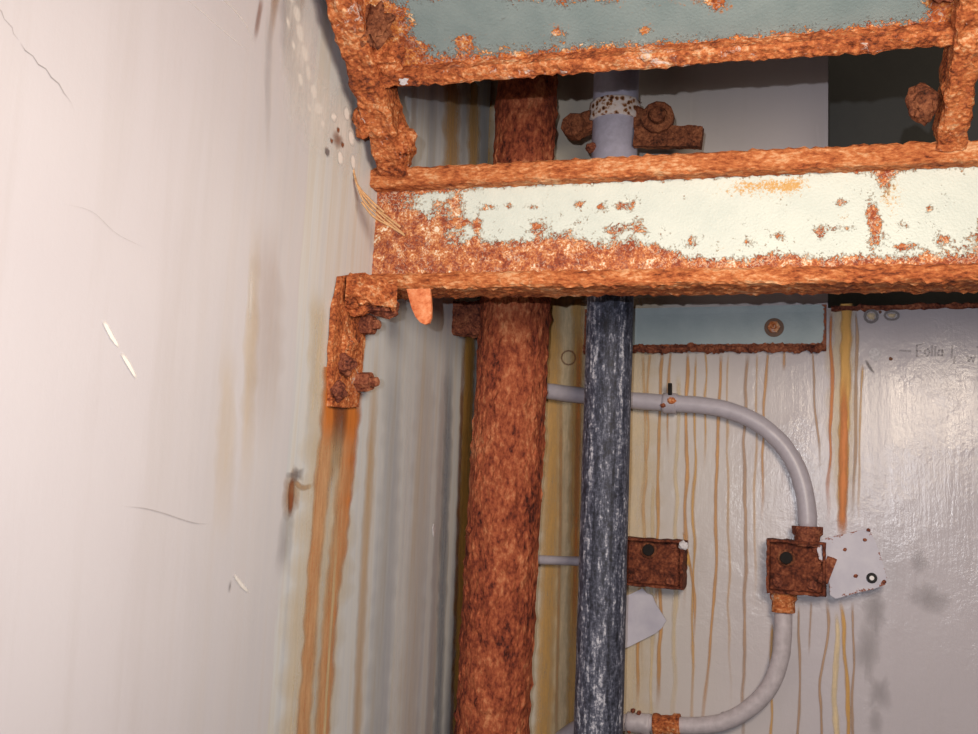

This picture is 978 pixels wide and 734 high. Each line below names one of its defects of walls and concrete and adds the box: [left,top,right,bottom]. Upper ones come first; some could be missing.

corrosion [447,83,458,165]
corrosion [470,82,490,165]
corrosion [547,296,586,387]
corrosion [629,304,863,539]
corrosion [286,367,361,734]
corrosion [451,336,475,734]
corrosion [538,399,583,734]
corrosion [675,413,720,669]
corrosion [650,627,663,693]
corrosion [796,612,811,734]
corrosion [819,610,855,734]